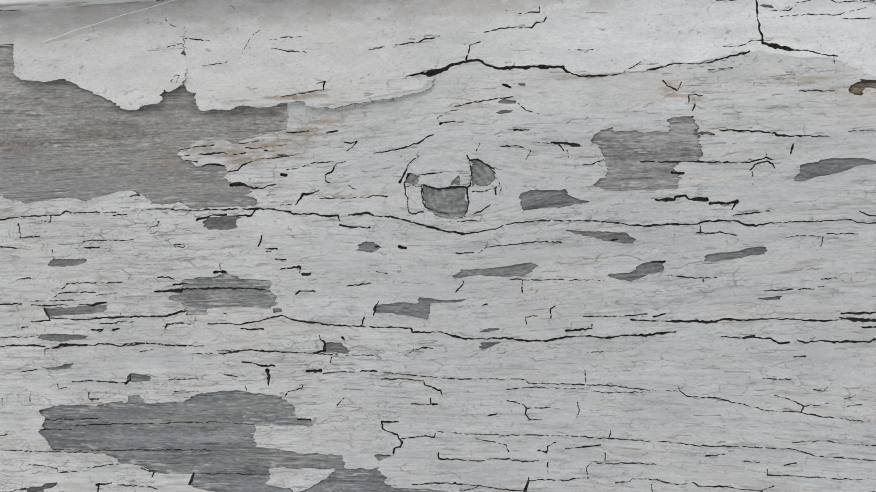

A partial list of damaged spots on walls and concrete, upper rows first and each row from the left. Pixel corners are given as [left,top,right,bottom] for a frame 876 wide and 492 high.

peeling [848,79,876,95]
peeling [0,4,439,230]
crack [0,0,876,254]
peeling [590,116,715,191]
peeling [794,158,876,182]
peeling [519,189,590,211]
peeling [168,272,282,318]
crack [258,235,316,294]
peeling [374,297,467,320]
peeling [453,262,538,280]
crack [0,260,876,492]
peeling [39,386,448,492]